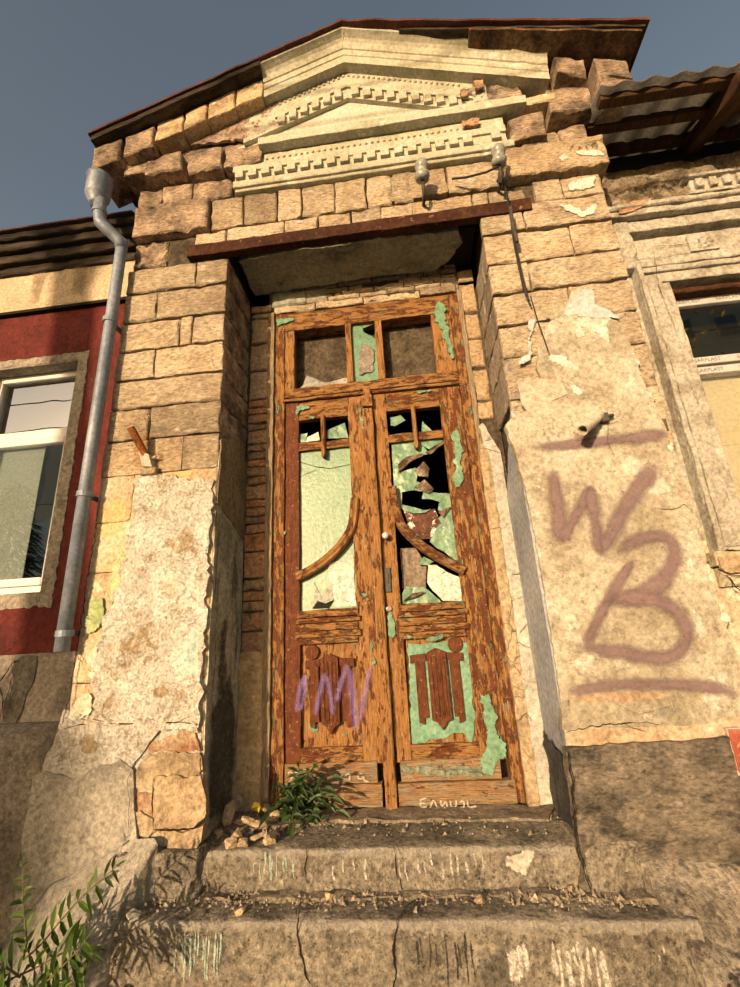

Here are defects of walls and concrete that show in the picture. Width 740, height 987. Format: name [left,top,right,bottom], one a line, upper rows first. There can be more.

flaking render [42,473,215,849]
flaking render [504,287,740,746]
crack [295,846,310,984]
crack [392,845,420,987]